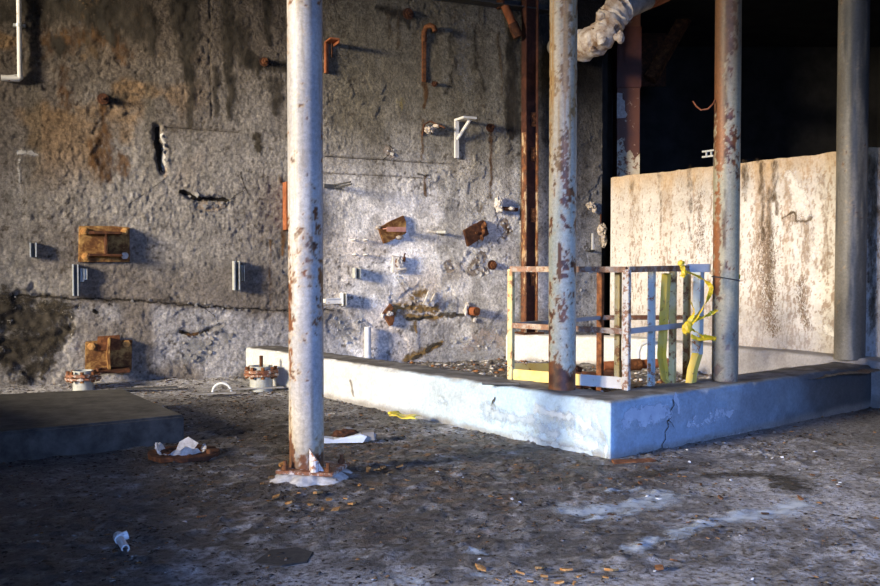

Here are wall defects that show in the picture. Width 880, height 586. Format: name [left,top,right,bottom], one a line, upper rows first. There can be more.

damp [168,0,201,127]
damp [213,0,287,119]
damp [0,284,76,385]
crack [0,293,289,338]
damp [754,218,784,342]
damp [794,275,812,329]